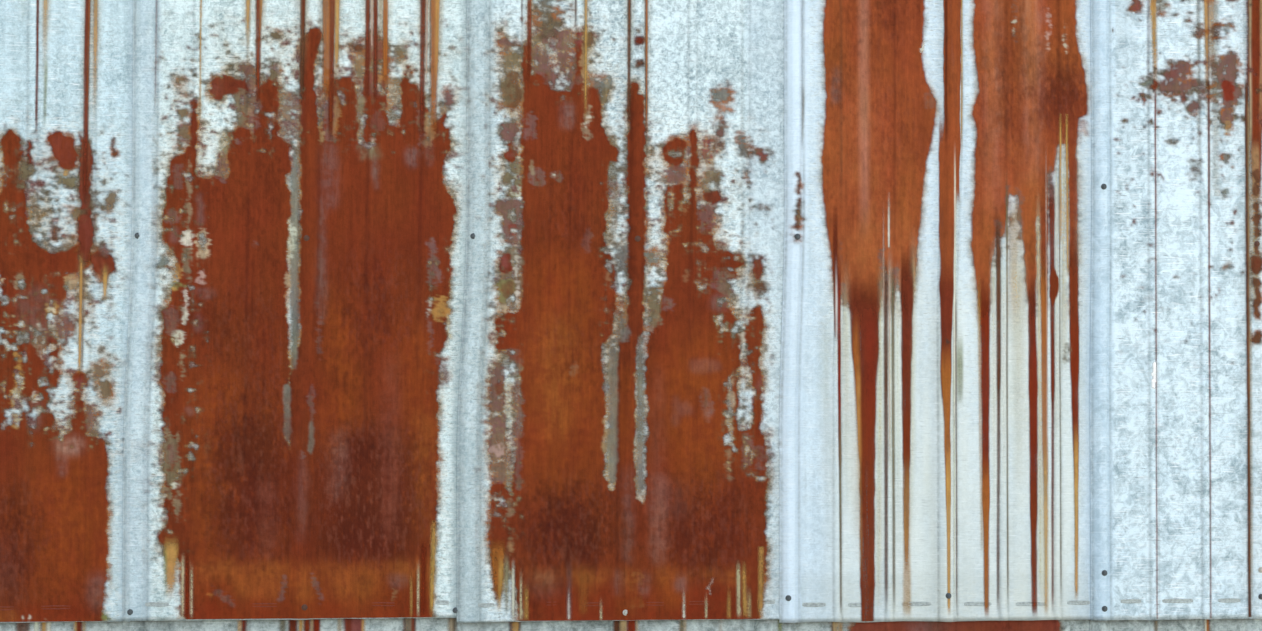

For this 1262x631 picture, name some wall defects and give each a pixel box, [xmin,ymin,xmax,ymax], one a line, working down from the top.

rust [0,0,117,631]
rust [155,0,458,631]
rust [485,0,774,631]
rust [821,0,1088,631]
rust [1128,0,1262,617]